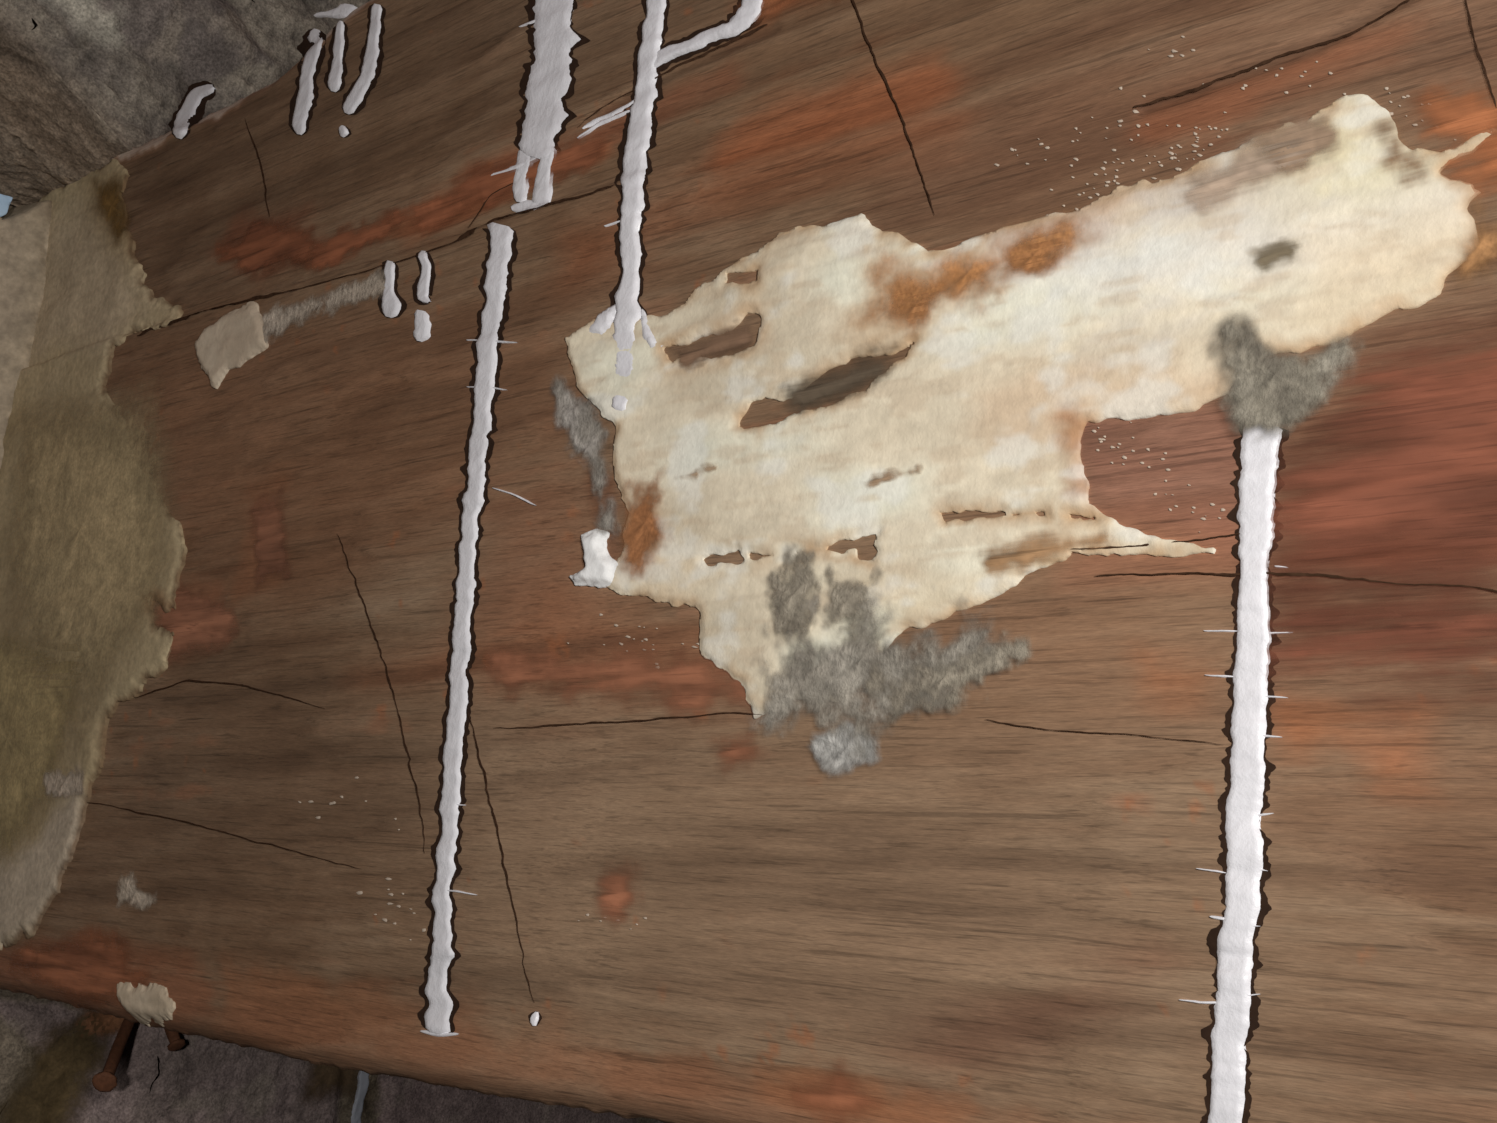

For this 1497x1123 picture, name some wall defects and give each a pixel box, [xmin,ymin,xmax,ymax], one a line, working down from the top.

damp [314,3,357,19]
crack [1133,0,1409,107]
crack [1465,0,1496,107]
corrosion [217,137,601,272]
damp [511,146,557,212]
damp [888,221,1077,324]
damp [1462,230,1497,273]
damp [622,485,661,573]
flaking render [116,982,176,1027]